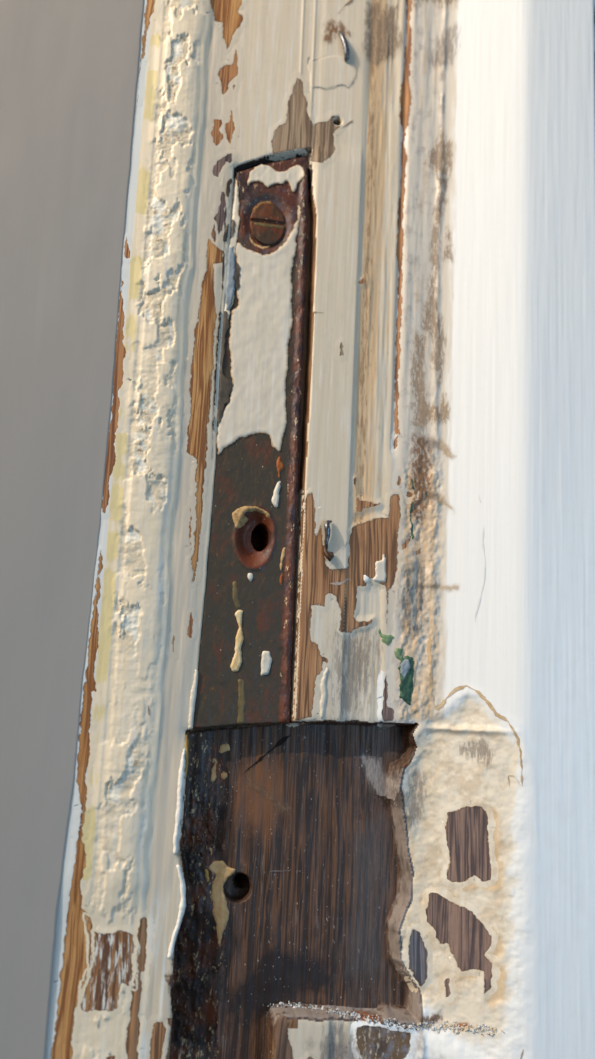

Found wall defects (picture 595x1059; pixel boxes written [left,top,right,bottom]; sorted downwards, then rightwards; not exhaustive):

peeling [136,0,162,108]
peeling [265,55,356,170]
peeling [101,232,137,520]
peeling [181,0,249,589]
peeling [391,0,412,454]
peeling [166,607,199,659]
peeling [286,469,419,727]
peeling [46,544,171,1059]
peeling [401,799,501,1005]
peeling [272,1011,321,1059]
peeling [350,1019,419,1059]